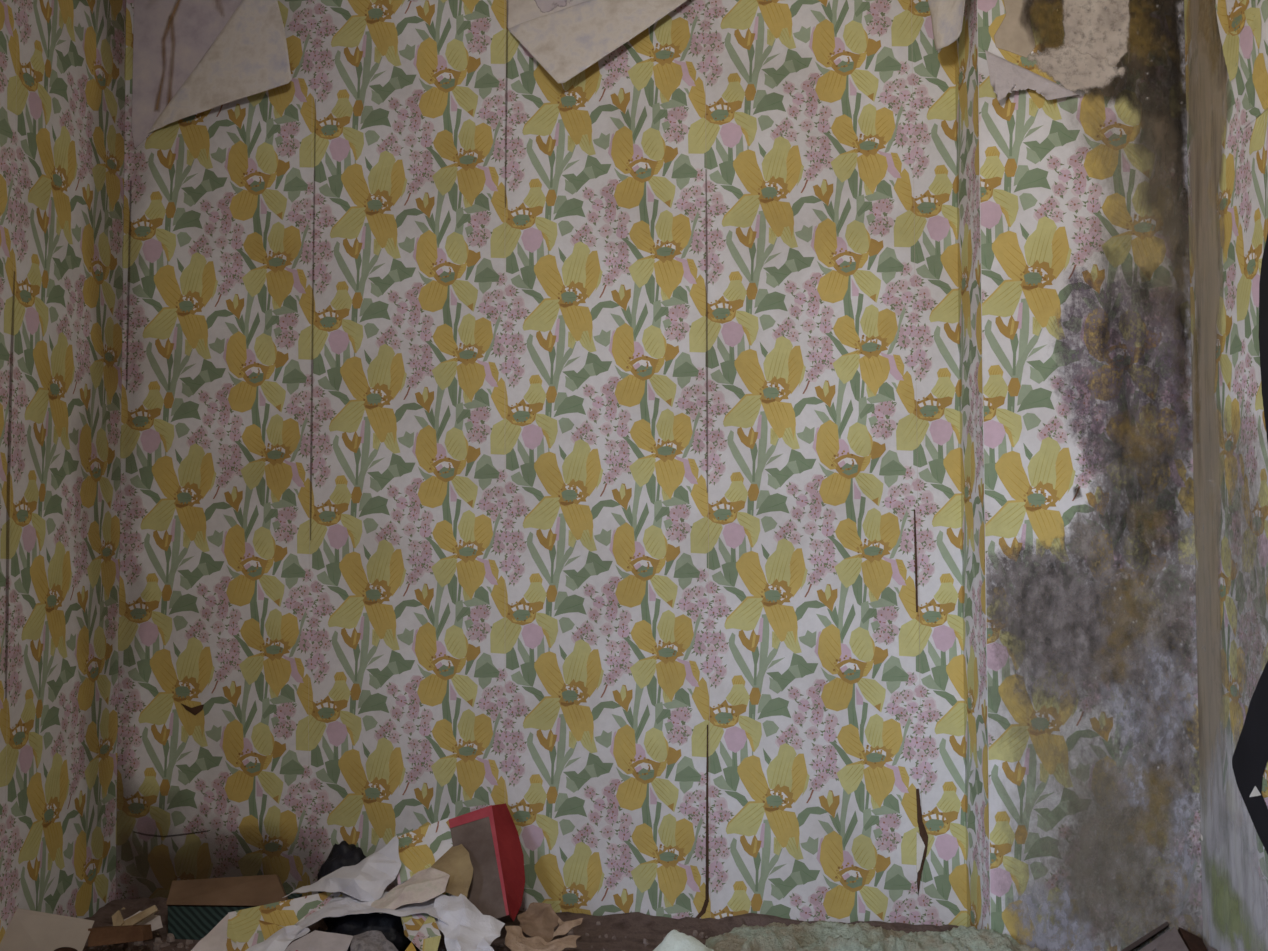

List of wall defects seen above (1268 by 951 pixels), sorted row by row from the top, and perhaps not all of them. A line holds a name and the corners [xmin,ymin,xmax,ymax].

flaking render [131,0,242,148]
spalling [994,0,1130,93]
water stain [986,0,1268,951]